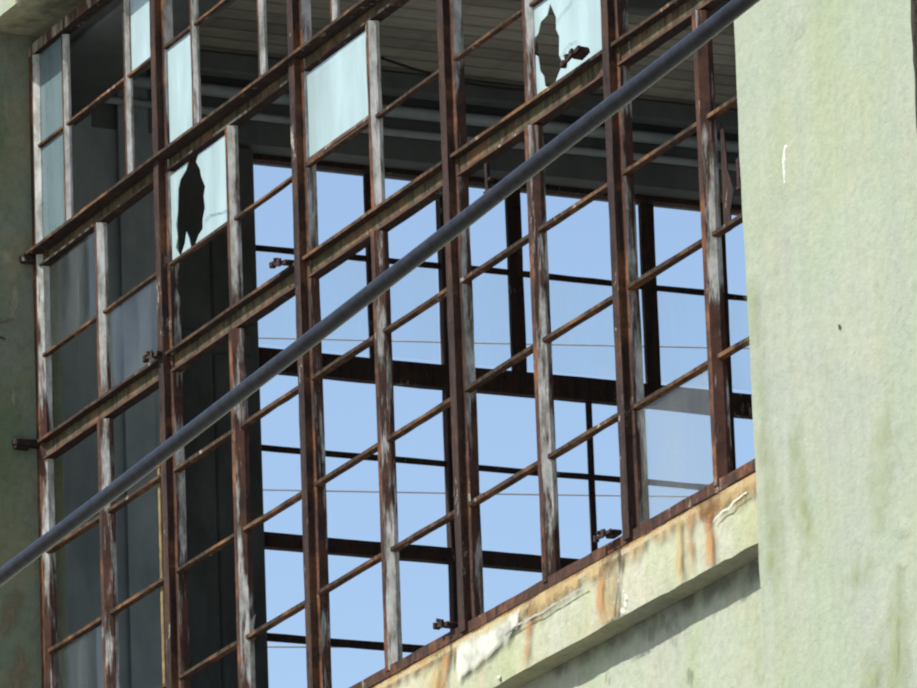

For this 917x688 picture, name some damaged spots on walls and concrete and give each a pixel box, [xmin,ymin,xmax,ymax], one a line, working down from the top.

corrosion [373,472,756,688]